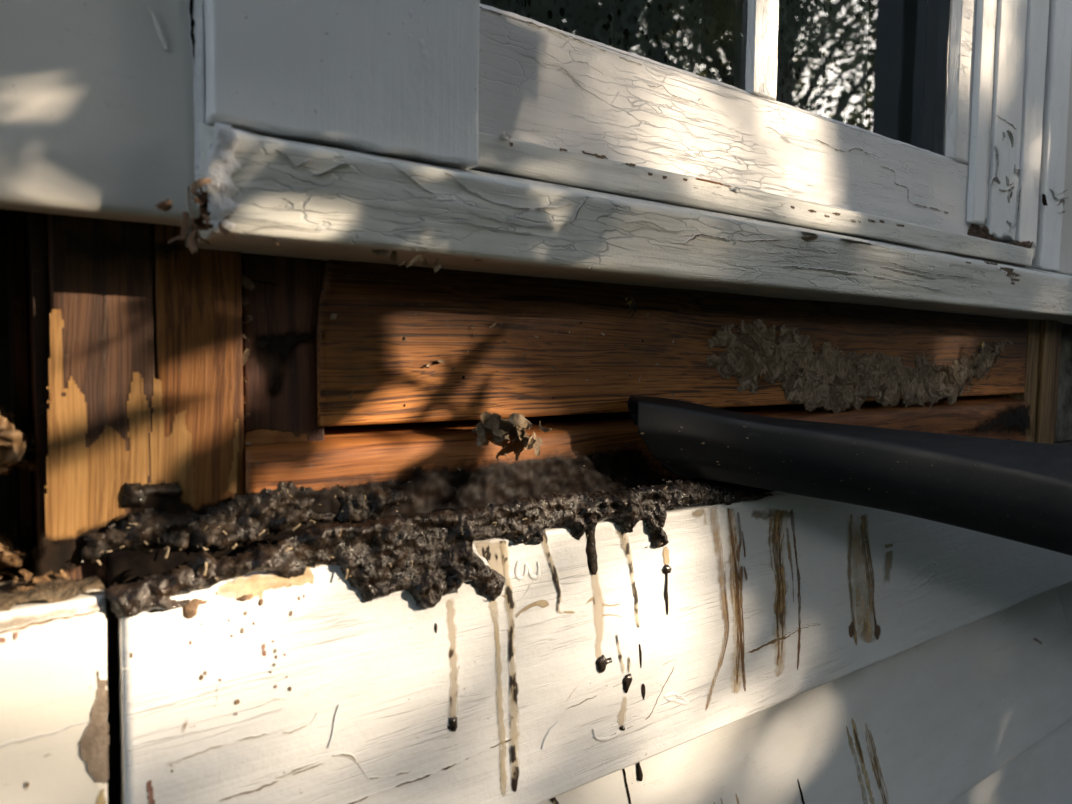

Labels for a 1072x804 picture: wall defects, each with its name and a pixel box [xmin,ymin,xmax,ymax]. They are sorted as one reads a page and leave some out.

crack [482,7,702,104]
crack [272,136,1055,295]
peeling [989,130,1021,232]
peeling [45,309,196,541]
leakage [38,482,233,576]
peeling [225,419,239,493]
leakage [270,449,672,539]
leakage [215,567,314,637]
peeling [79,671,110,783]
crack [168,616,462,766]
crack [212,734,519,804]
leakage [447,648,458,732]